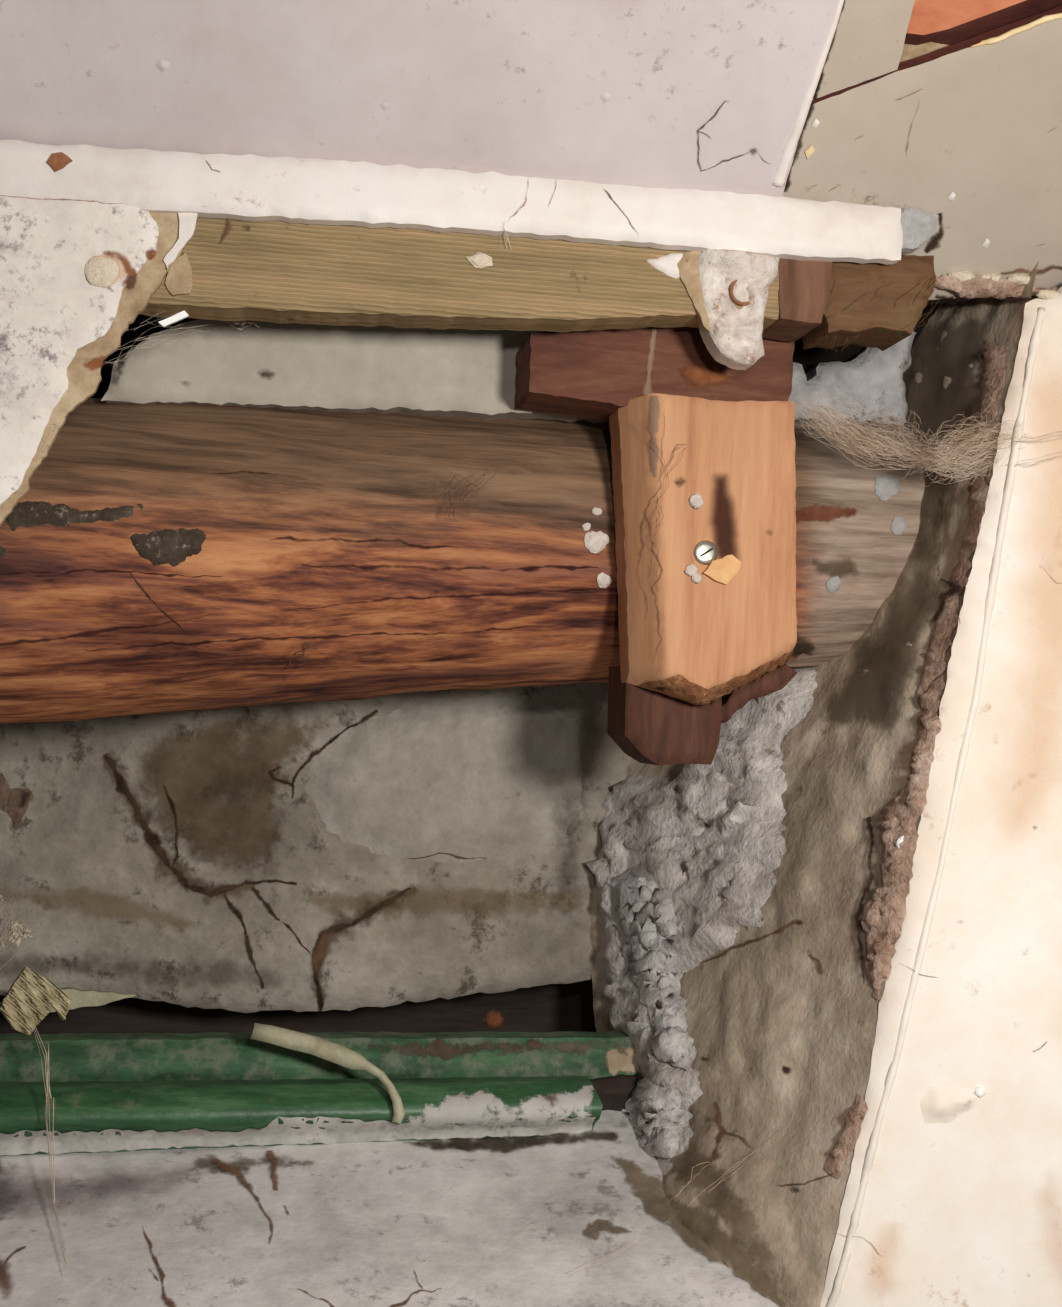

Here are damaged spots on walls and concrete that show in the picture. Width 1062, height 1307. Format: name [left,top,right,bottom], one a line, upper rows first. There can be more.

crack [697,0,845,192]
peeling [165,252,193,297]
spalling [855,339,1009,1001]
water stain [145,720,311,868]
crack [268,710,378,799]
crack [103,752,483,1012]
peeling [250,1023,594,1131]
corrosion [0,1246,26,1294]
crack [144,1231,175,1307]
crack [390,1270,441,1307]